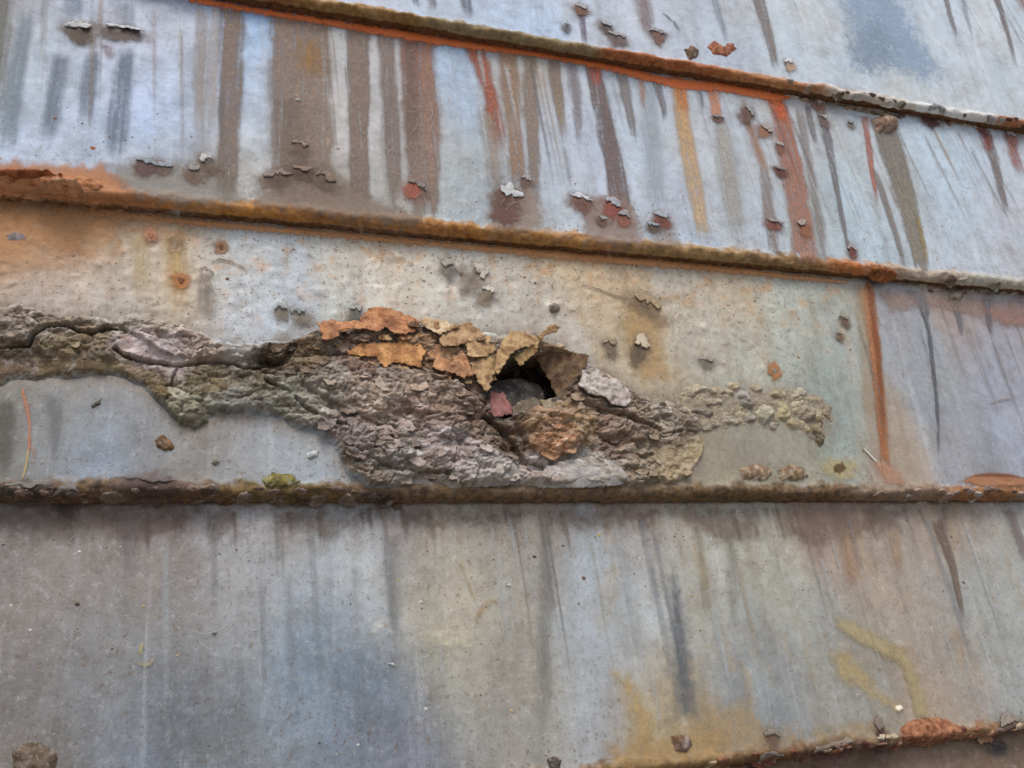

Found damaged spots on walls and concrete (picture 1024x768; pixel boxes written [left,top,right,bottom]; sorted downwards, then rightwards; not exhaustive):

damp [0,0,31,135]
damp [45,57,67,131]
damp [80,45,132,148]
corrosion [0,0,927,312]
peeling [492,174,533,227]
peeling [569,192,630,227]
peeling [647,210,670,232]
corrosion [945,113,1024,206]
spalling [0,301,704,489]
corrosion [858,280,1024,549]
corrosion [934,519,963,610]
corrosion [612,681,1024,768]